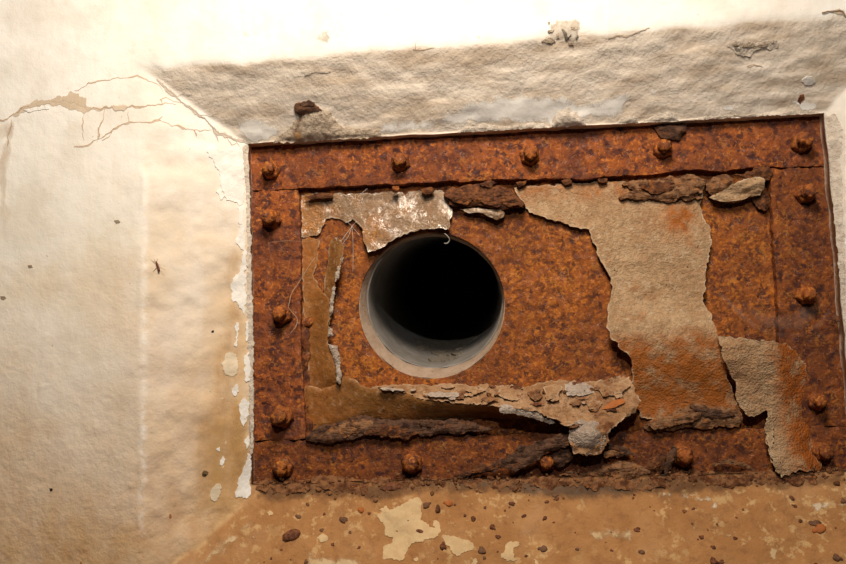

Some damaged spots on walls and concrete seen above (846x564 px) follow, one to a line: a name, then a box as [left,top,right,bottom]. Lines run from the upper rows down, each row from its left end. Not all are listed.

crack [822,9,846,17]
crack [0,75,251,147]
spalling [273,100,382,144]
spalling [457,107,586,133]
spalling [616,111,678,125]
spalling [690,110,846,345]
peeling [206,145,255,501]
peeling [301,177,822,480]
corrosion [282,529,301,542]
peeling [376,497,477,564]
corrosion [423,500,453,512]
corrosion [808,520,826,533]